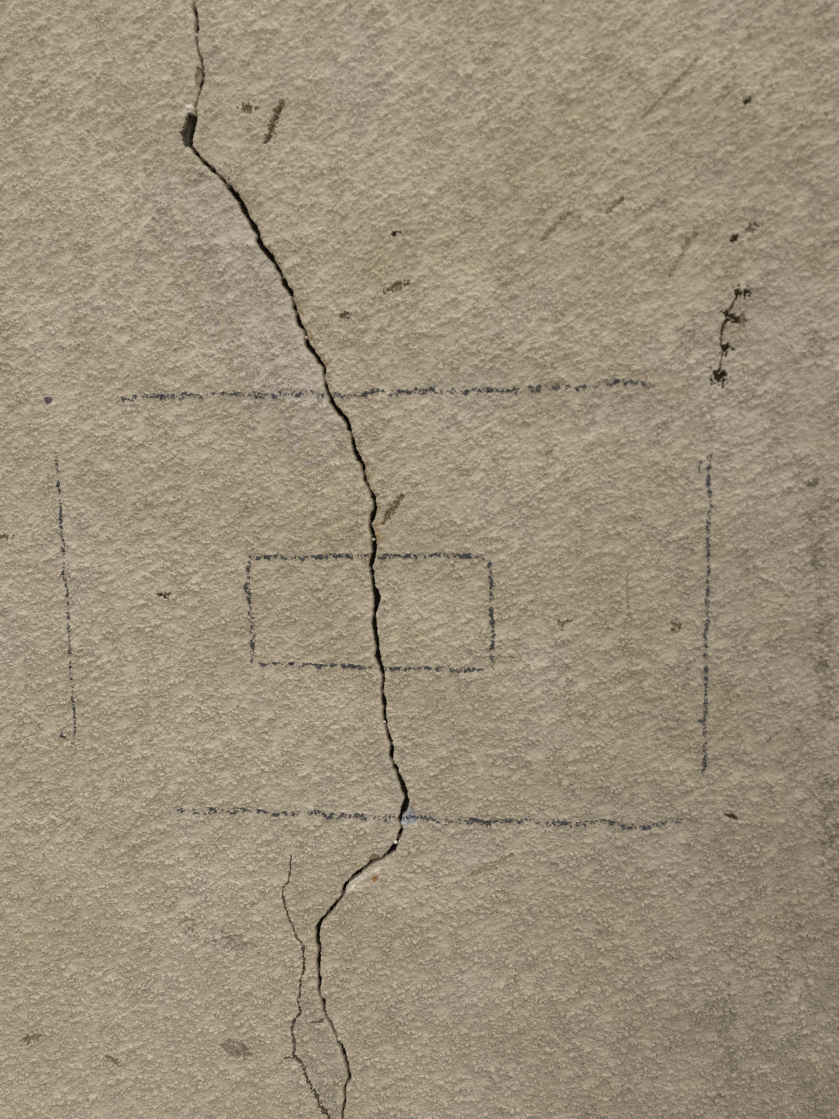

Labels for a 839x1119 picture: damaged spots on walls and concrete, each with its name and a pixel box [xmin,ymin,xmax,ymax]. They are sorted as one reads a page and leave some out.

crack [178,10,410,1119]